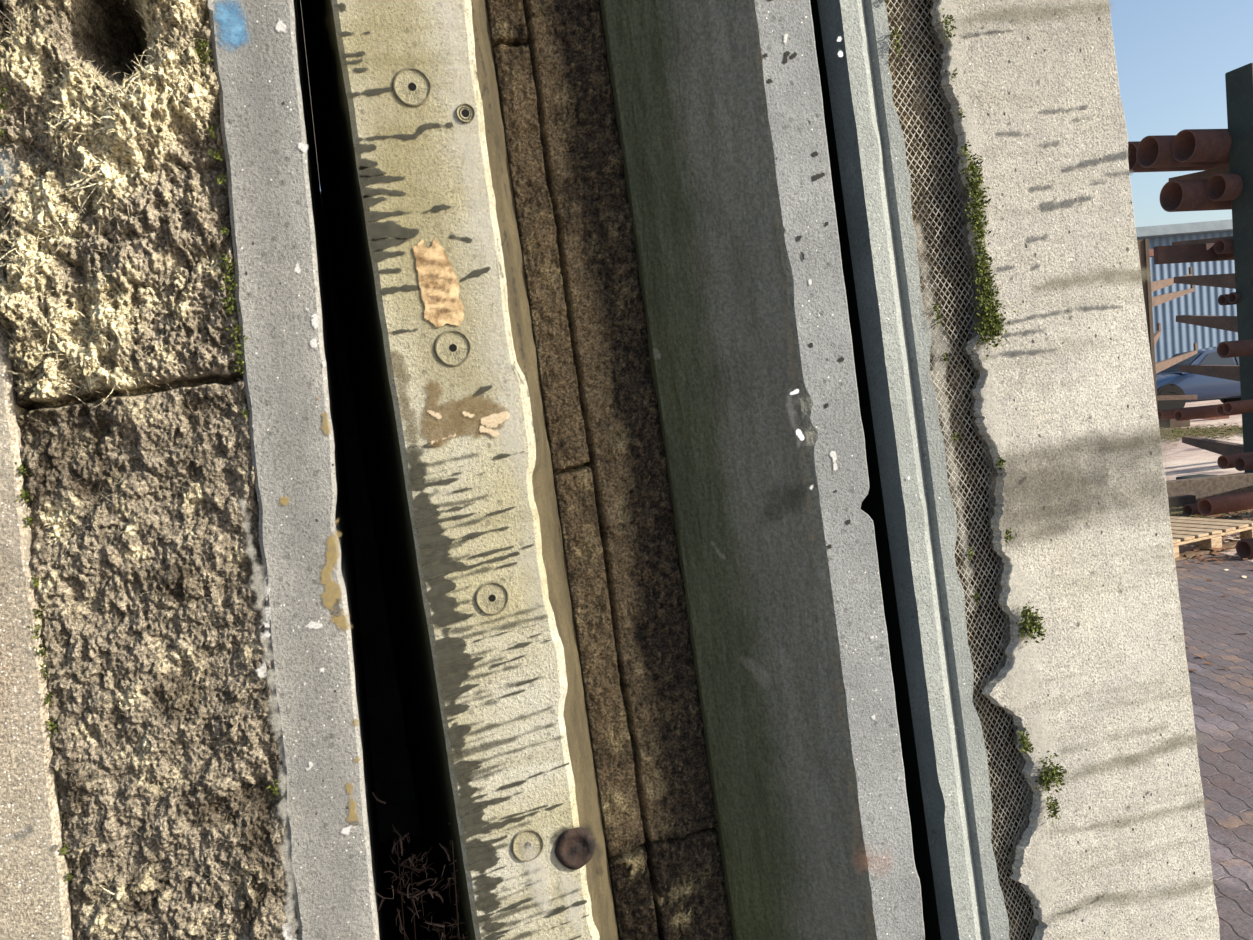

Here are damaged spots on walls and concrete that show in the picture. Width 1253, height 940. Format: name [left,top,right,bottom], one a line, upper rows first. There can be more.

peeling [422,382,510,447]
leakage [407,443,589,940]
corrosion [553,827,602,911]